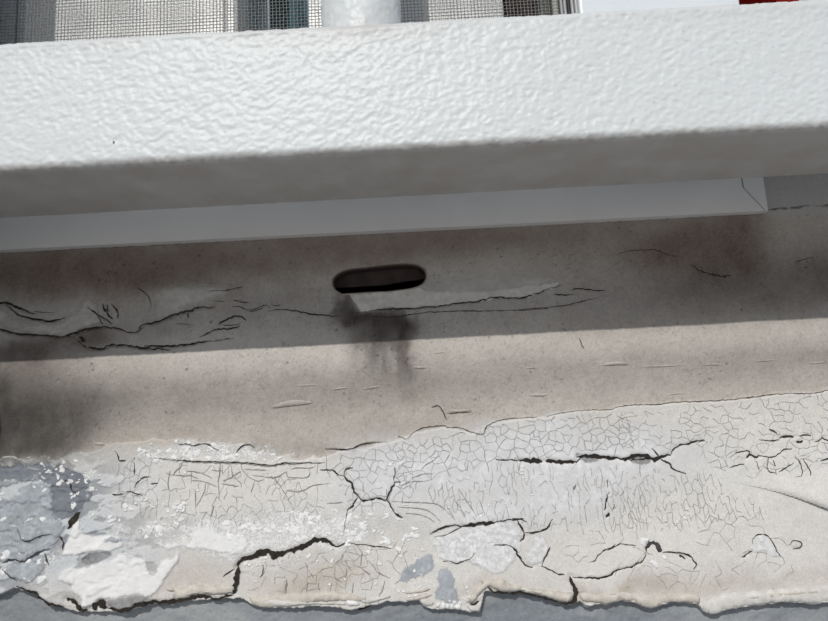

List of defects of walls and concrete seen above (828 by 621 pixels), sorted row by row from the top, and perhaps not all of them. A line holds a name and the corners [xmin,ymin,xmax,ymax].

crack [0,287,333,350]
water stain [341,297,415,355]
peeling [350,279,559,312]
crack [357,284,605,318]
water stain [0,379,106,510]
spalling [0,462,92,583]
water stain [0,414,687,609]
crack [0,394,828,613]
peeling [167,584,234,600]
peeling [249,591,390,608]